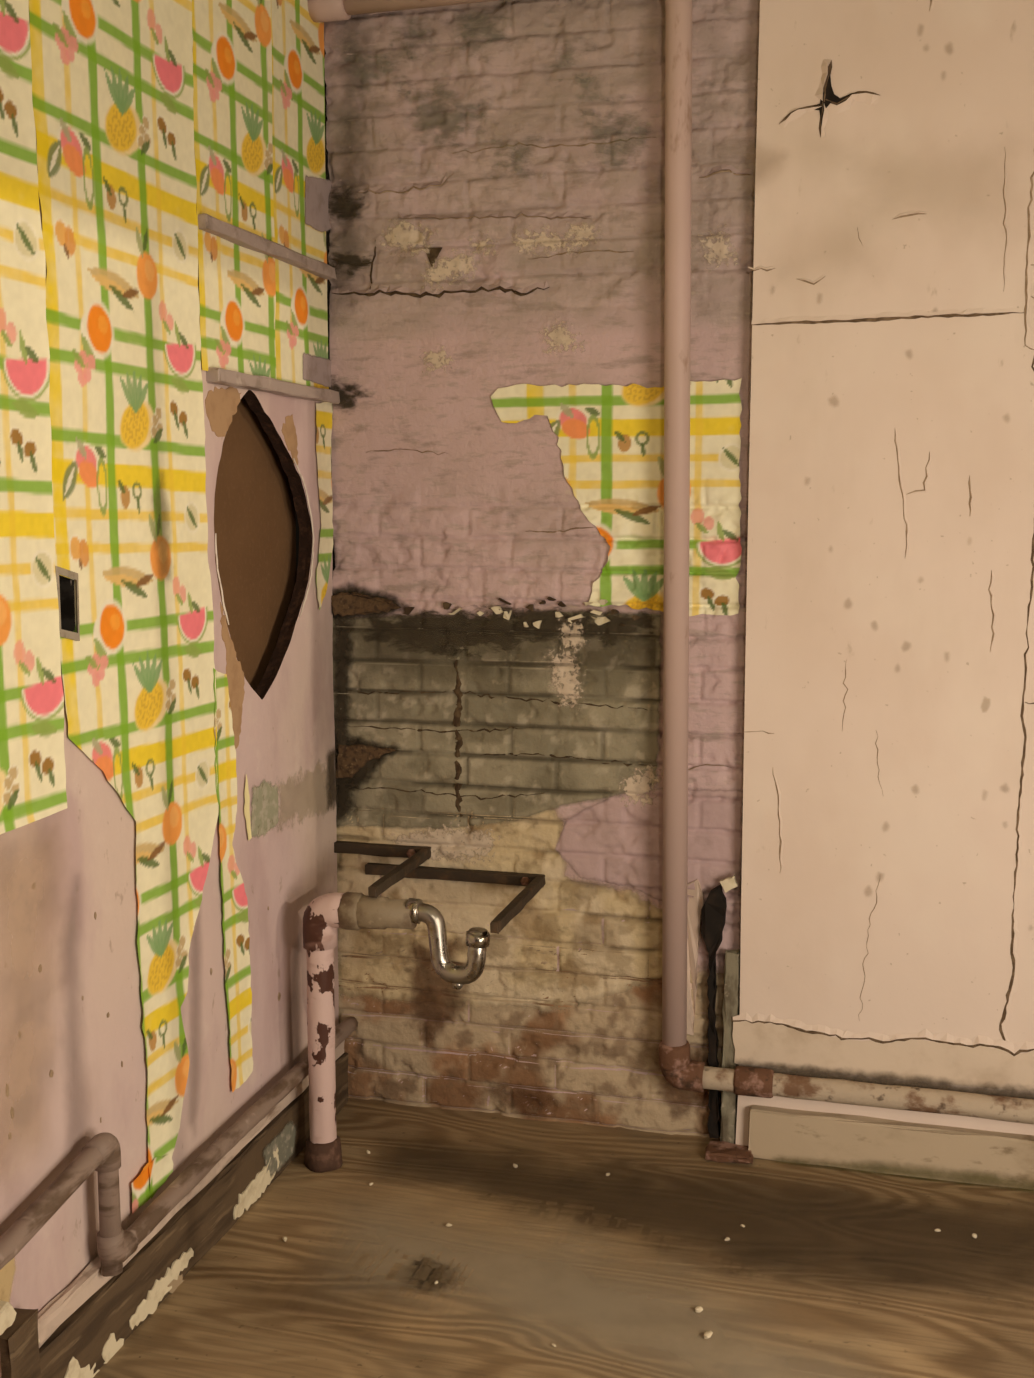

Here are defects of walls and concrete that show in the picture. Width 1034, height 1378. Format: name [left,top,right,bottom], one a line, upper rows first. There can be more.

crack [779,59,881,137]
crack [332,137,657,298]
crack [748,147,1034,371]
spalling [205,386,314,749]
crack [894,428,932,559]
crack [967,476,975,516]
leakage [332,618,354,824]
crack [988,534,1034,1042]
peeling [687,879,1034,1091]
crack [858,880,880,1021]
peeling [233,1147,280,1219]
peeling [64,1248,194,1378]